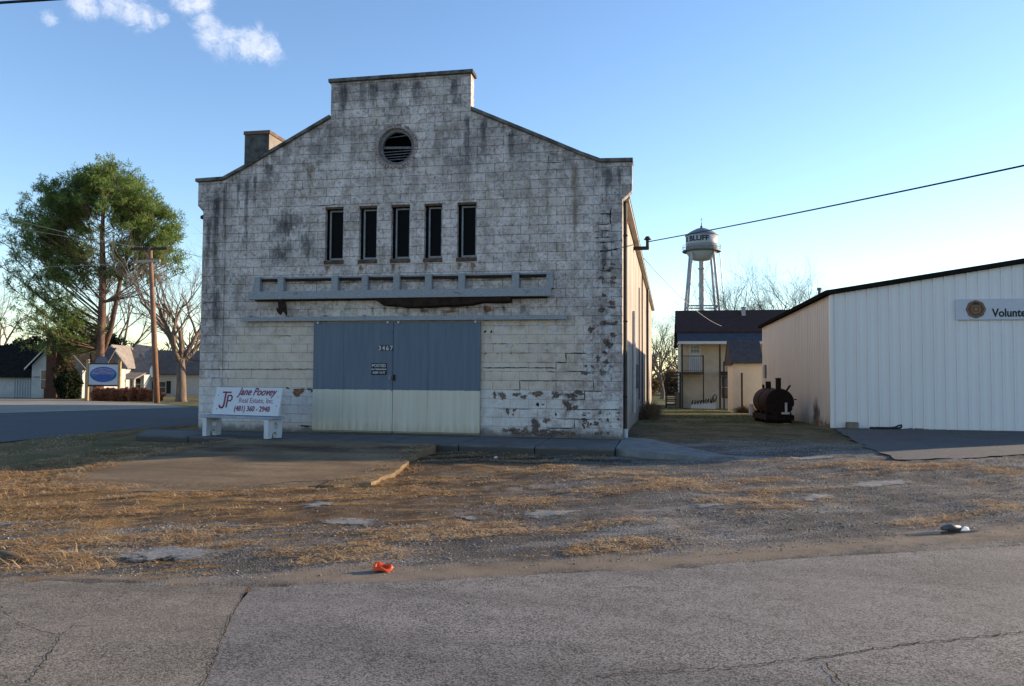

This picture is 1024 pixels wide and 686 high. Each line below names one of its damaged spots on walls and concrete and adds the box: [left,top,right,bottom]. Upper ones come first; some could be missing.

leakage [207,177,256,307]
peeling [581,259,618,383]
peeling [493,390,620,438]